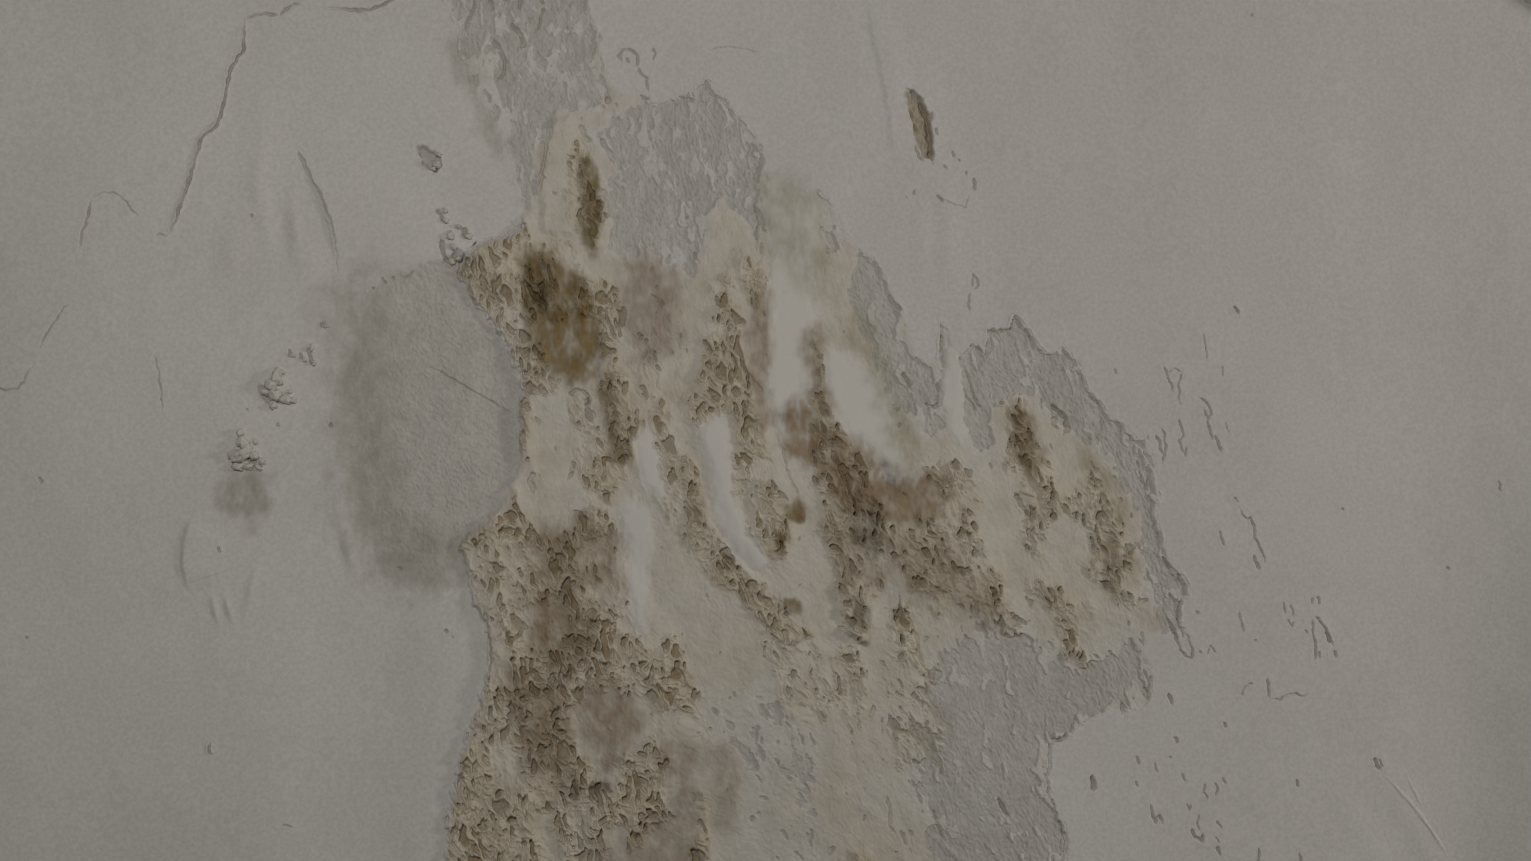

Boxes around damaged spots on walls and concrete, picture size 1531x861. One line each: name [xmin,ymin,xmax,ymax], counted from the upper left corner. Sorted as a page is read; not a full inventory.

crack [163,0,406,236]
crack [288,142,347,280]
flaking render [226,0,1210,861]
water stain [786,409,936,521]
peeling [1188,390,1234,458]
peeling [1227,489,1273,577]
crack [1234,672,1316,707]